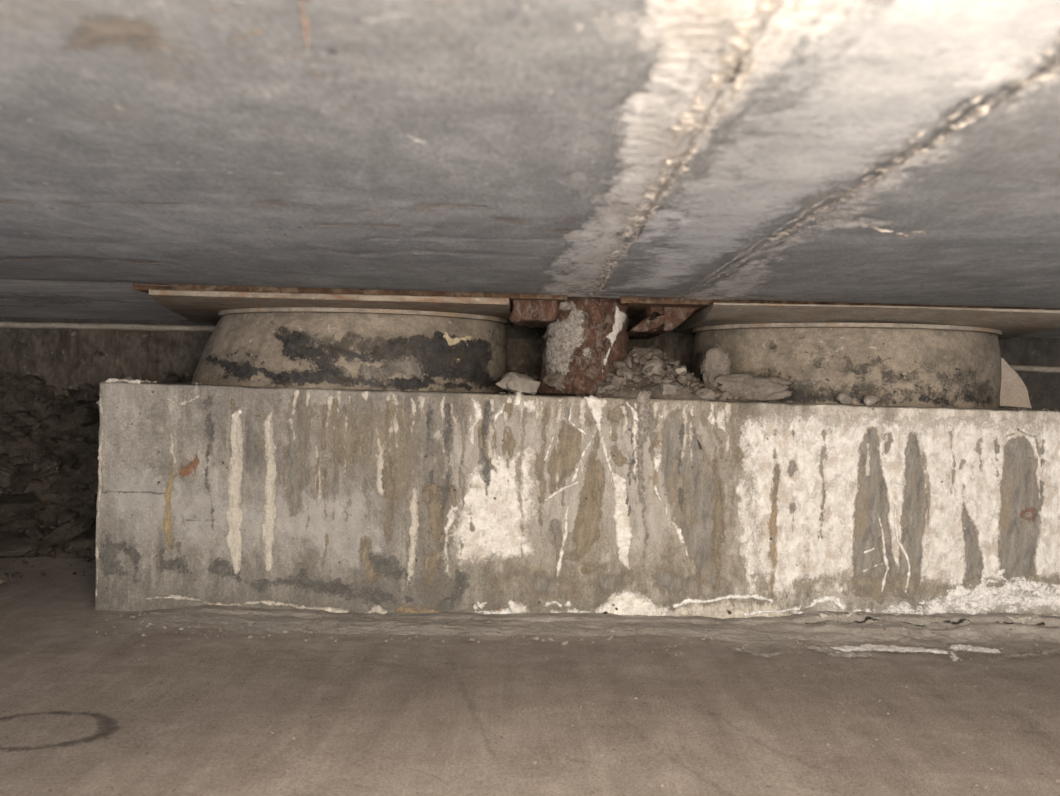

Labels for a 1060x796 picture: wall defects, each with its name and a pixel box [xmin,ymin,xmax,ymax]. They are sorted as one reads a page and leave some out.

crack [586,0,806,297]
leakage [530,0,1060,300]
crack [674,39,1060,301]
corrosion [163,427,200,552]
leakage [99,389,1060,624]